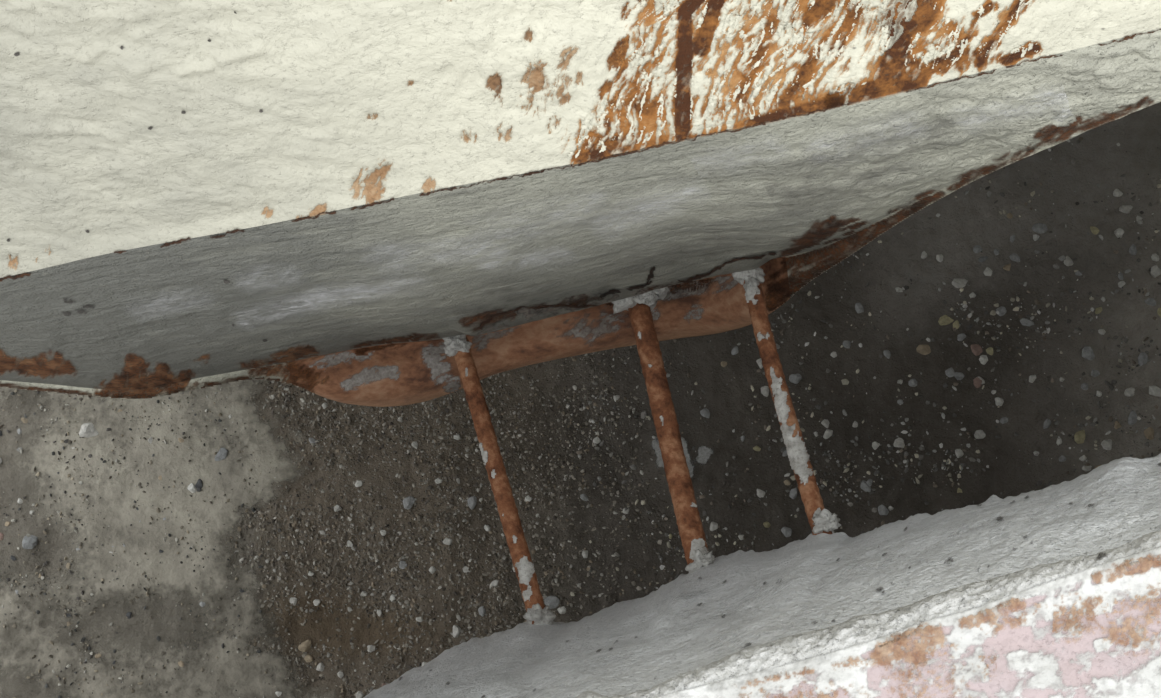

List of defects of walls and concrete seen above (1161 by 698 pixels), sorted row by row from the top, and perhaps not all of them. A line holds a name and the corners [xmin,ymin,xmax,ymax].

corrosion [486,73,503,106]
corrosion [520,47,583,134]
corrosion [568,0,1043,164]
corrosion [350,160,392,204]
corrosion [0,345,329,399]
peeling [310,351,401,391]
corrosion [354,333,439,355]
peeling [422,342,468,392]
peeling [770,367,813,485]
peeling [479,443,496,478]
peeling [514,556,535,601]
peeling [576,529,1161,698]